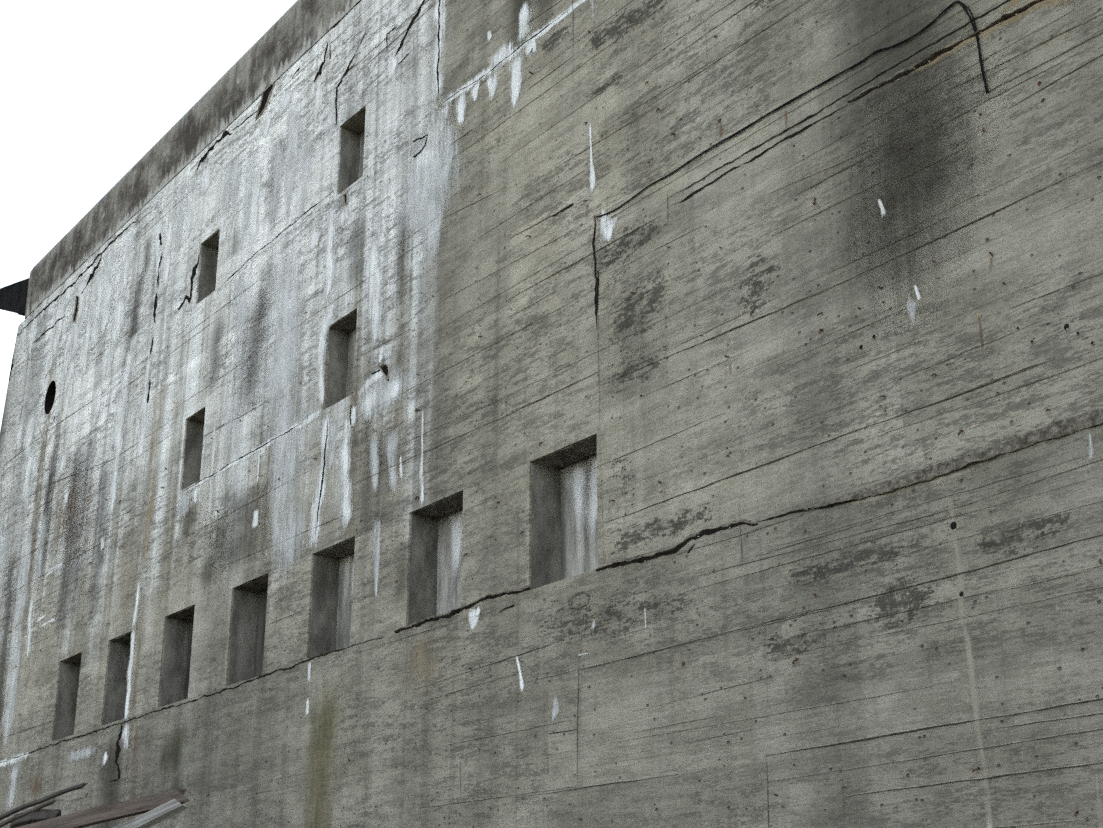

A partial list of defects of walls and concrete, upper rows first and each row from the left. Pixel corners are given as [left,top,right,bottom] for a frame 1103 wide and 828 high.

leakage [516,0,530,41]
leakage [583,0,667,50]
crack [195,110,258,172]
leakage [590,74,622,99]
crack [667,0,1043,207]
crack [9,217,139,381]
crack [150,233,201,354]
leakage [16,231,151,513]
leakage [309,208,389,547]
efflorescence [371,434,403,491]
crack [595,506,832,571]
crack [0,585,531,782]